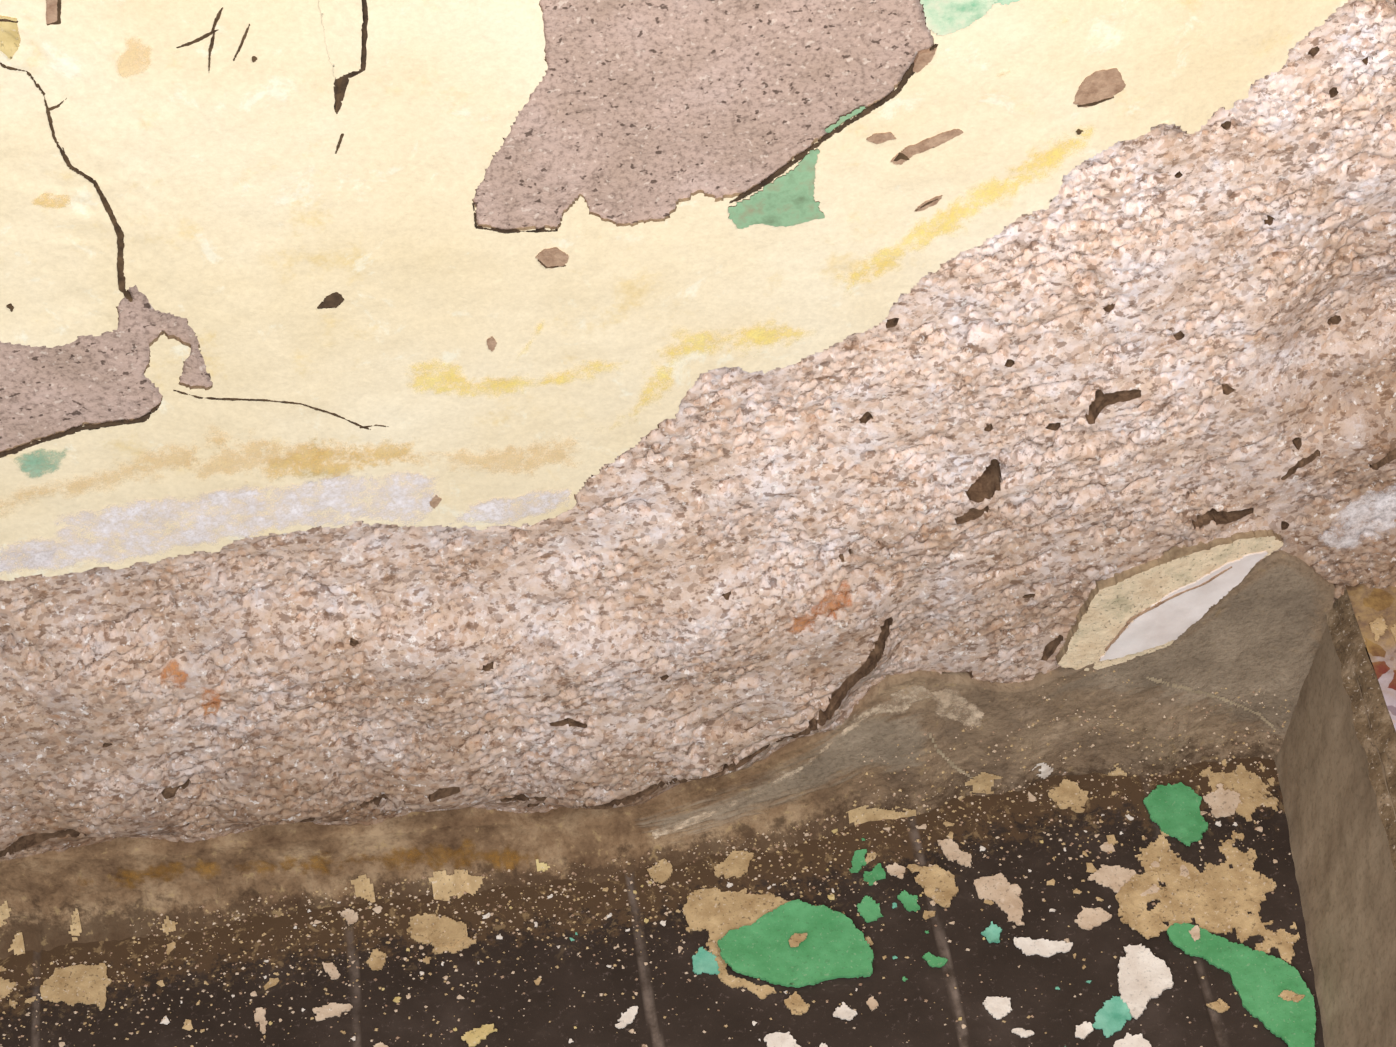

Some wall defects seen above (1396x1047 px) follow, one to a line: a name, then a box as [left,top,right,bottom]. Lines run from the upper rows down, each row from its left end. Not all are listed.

spalling [0,15,20,59]
crack [176,24,250,71]
peeling [319,0,368,114]
peeling [472,0,938,269]
crack [0,63,133,302]
spalling [317,292,344,309]
peeling [0,285,213,458]
spalling [487,336,497,352]
flaking render [646,0,1396,692]
crack [173,390,389,430]
peeling [965,772,1002,795]
peeling [1032,762,1089,813]